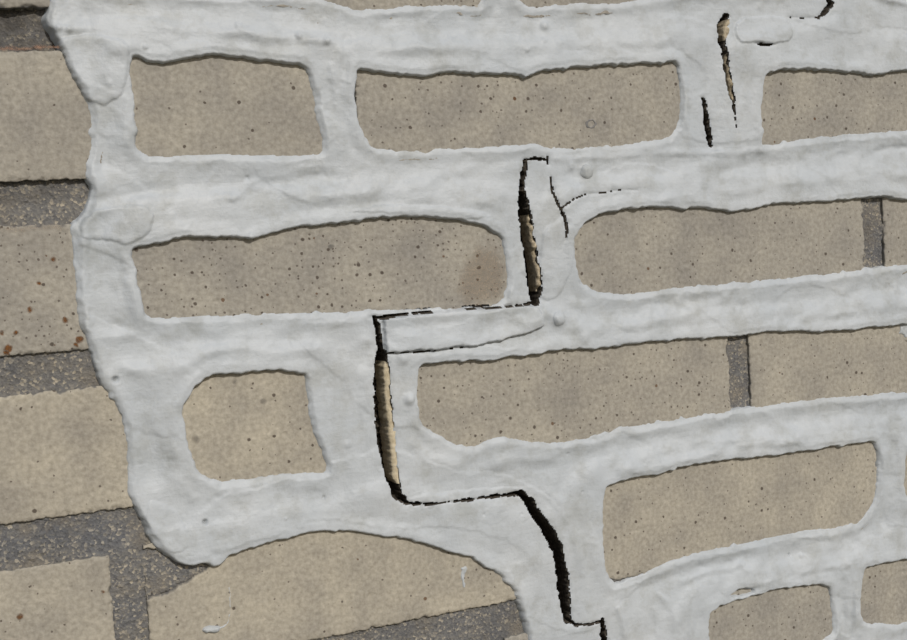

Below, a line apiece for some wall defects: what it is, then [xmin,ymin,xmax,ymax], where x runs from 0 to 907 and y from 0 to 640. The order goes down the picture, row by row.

crack [789,0,834,19]
crack [701,97,713,148]
crack [717,13,737,128]
crack [464,156,621,310]
crack [372,310,607,640]